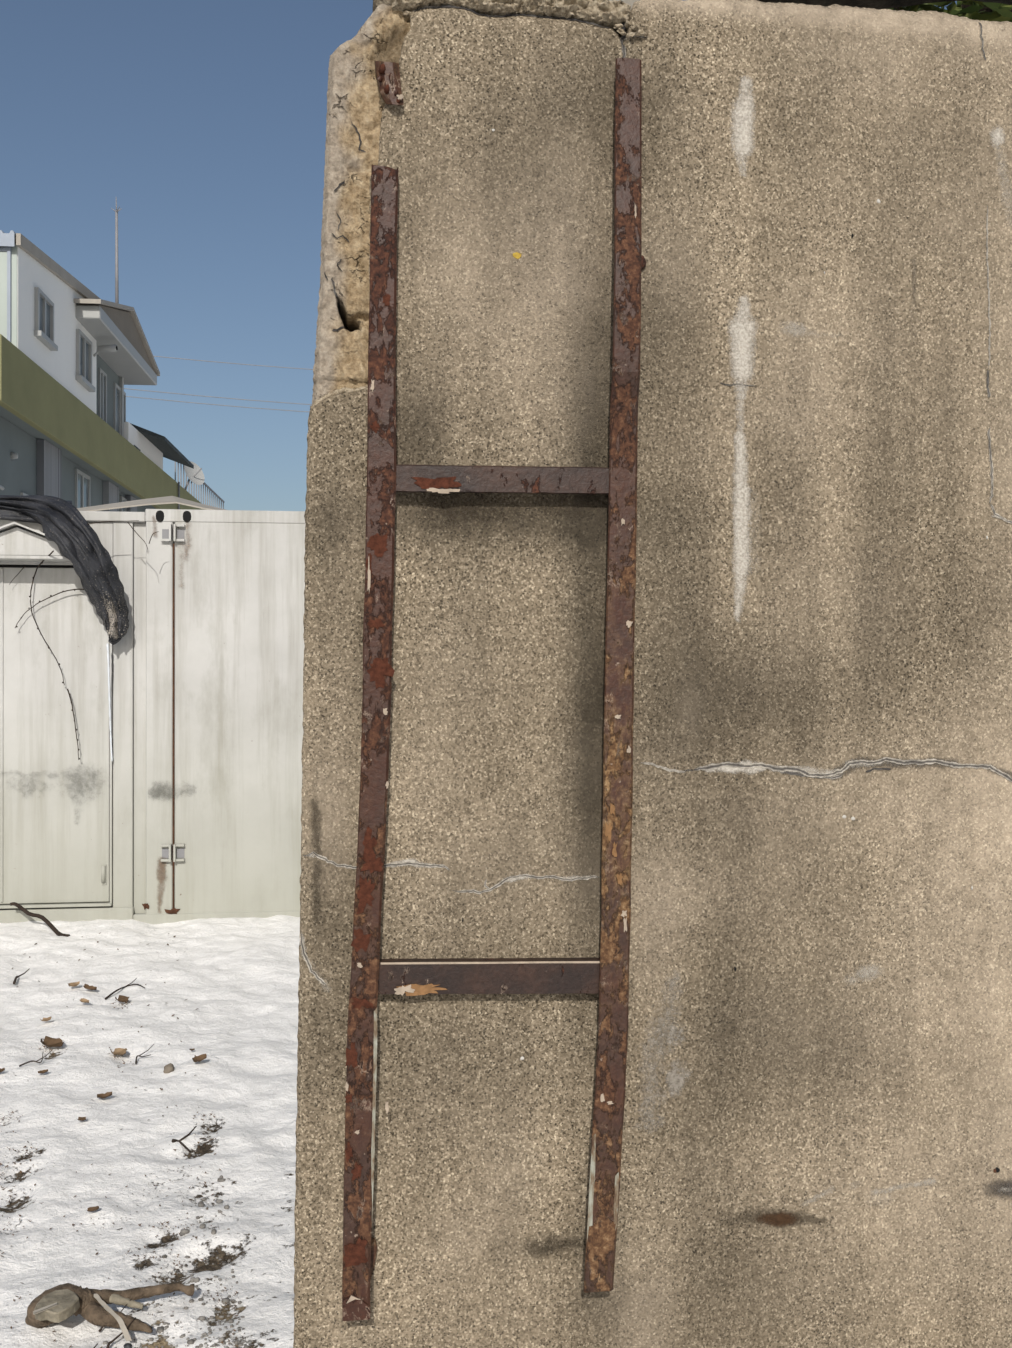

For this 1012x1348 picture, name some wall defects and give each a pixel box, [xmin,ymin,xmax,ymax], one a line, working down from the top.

water stain [732,78,753,174]
spalling [310,0,648,408]
water stain [730,297,754,620]
crack [642,757,1012,782]
rust [757,1213,819,1226]
water stain [990,1181,1012,1196]